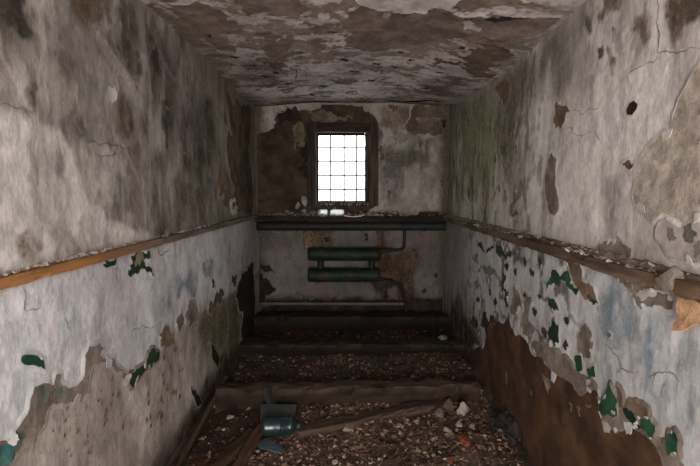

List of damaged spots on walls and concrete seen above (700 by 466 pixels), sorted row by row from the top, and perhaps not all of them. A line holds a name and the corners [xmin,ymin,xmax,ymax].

peeling [157,0,562,108]
crack [627,1,696,82]
leakage [161,98,171,137]
peeling [216,56,700,275]
leakage [18,235,41,258]
flaking render [0,243,278,466]
flaking render [468,238,684,466]
crack [605,344,679,394]